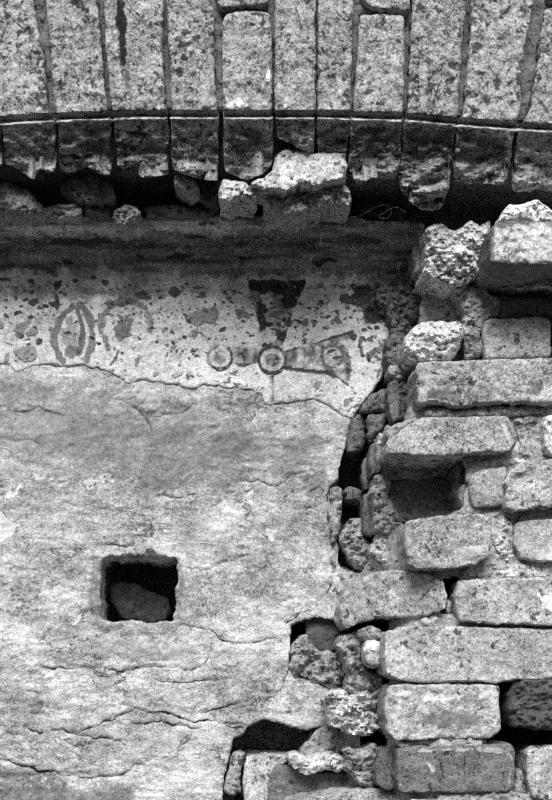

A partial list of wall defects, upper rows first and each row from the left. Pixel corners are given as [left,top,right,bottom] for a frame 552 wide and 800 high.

water stain [115,0,129,82]
peeling [33,237,120,248]
peeling [0,275,387,362]
spalling [526,376,543,395]
flaking render [329,486,343,545]
crack [40,582,331,702]
crack [4,691,243,760]
crack [10,761,59,774]